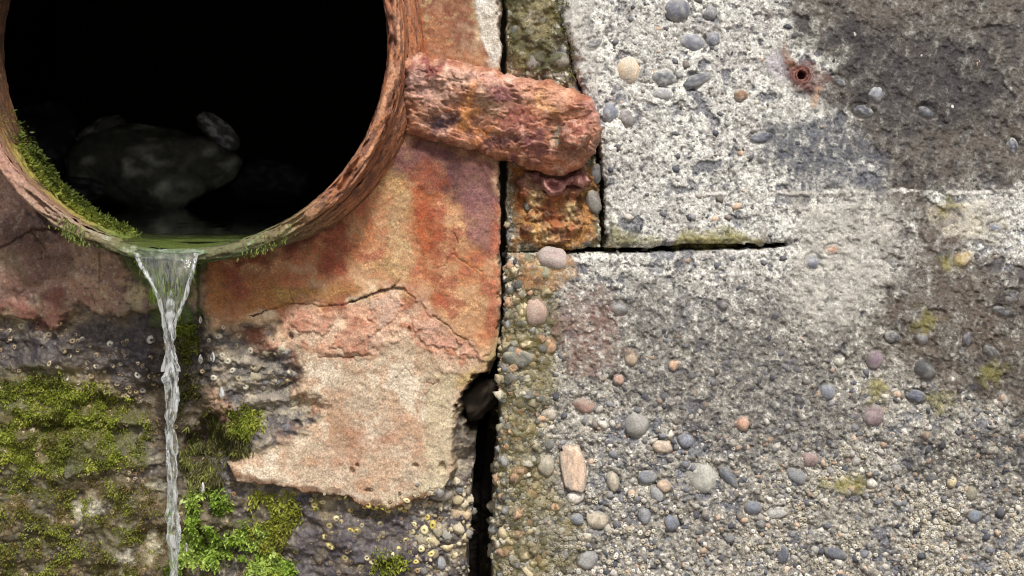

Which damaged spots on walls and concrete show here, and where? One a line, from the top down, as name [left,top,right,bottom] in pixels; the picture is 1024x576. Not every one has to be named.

corrosion [418,0,487,67]
crack [556,1,583,94]
corrosion [787,58,830,106]
corrosion [510,162,595,288]
crack [564,146,786,254]
leakage [764,0,1024,417]
crack [250,277,472,341]
crack [501,251,538,316]
leakage [0,264,217,492]
crack [468,348,499,576]